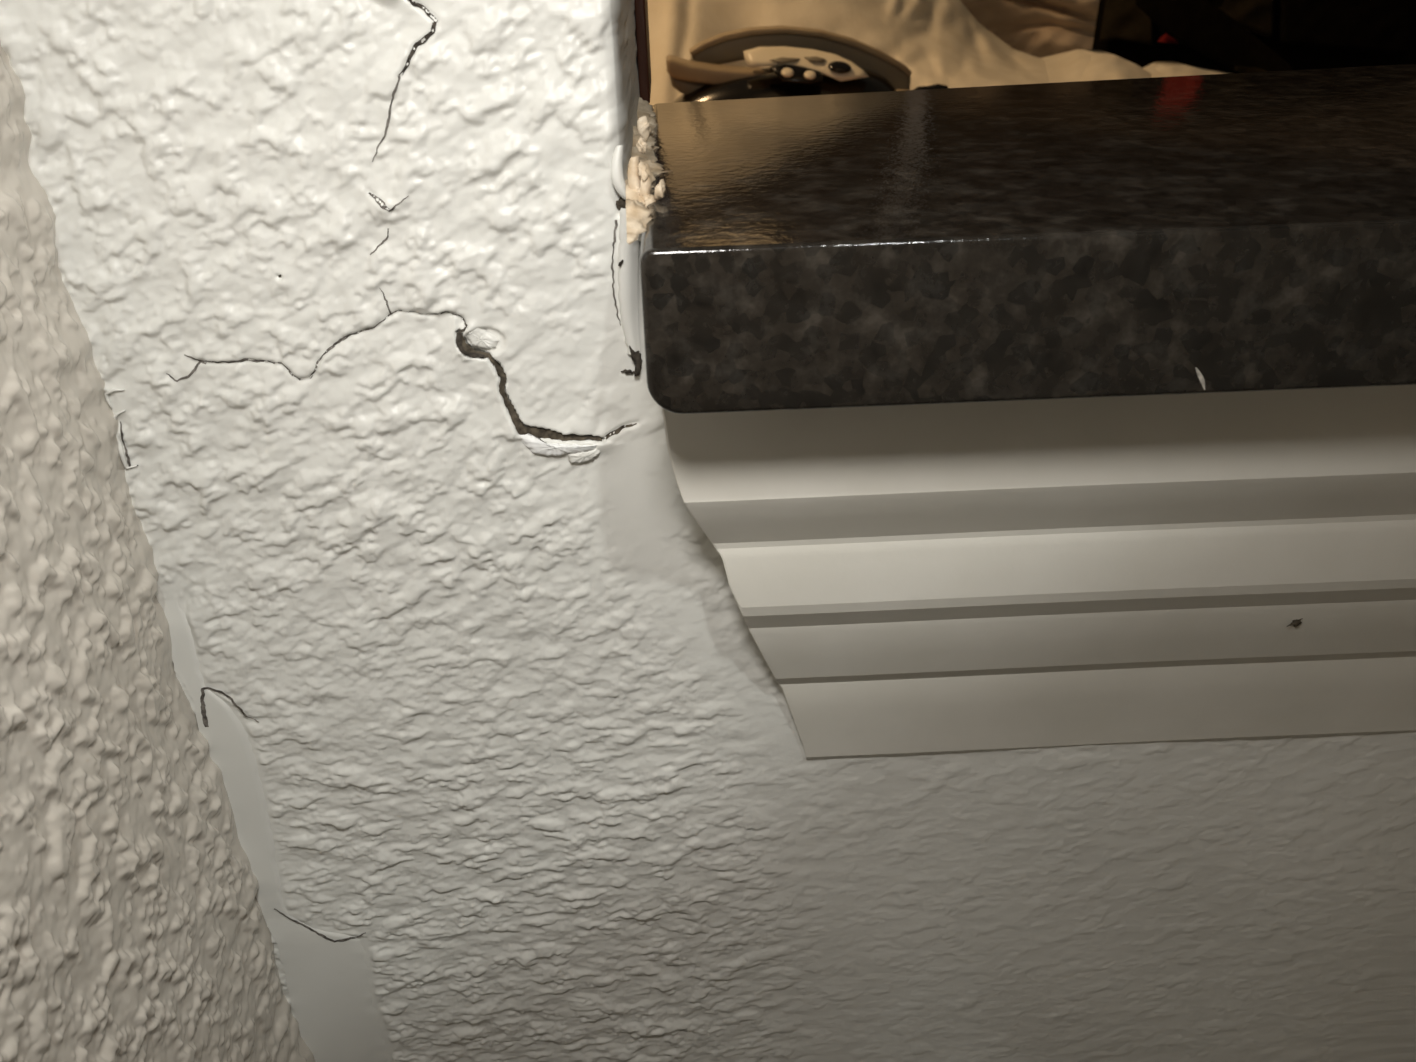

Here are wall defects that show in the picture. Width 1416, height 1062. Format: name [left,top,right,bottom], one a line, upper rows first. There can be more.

crack [368,0,438,255]
flaking render [611,97,671,245]
crack [611,220,621,326]
crack [166,289,637,463]
peeling [160,600,290,927]